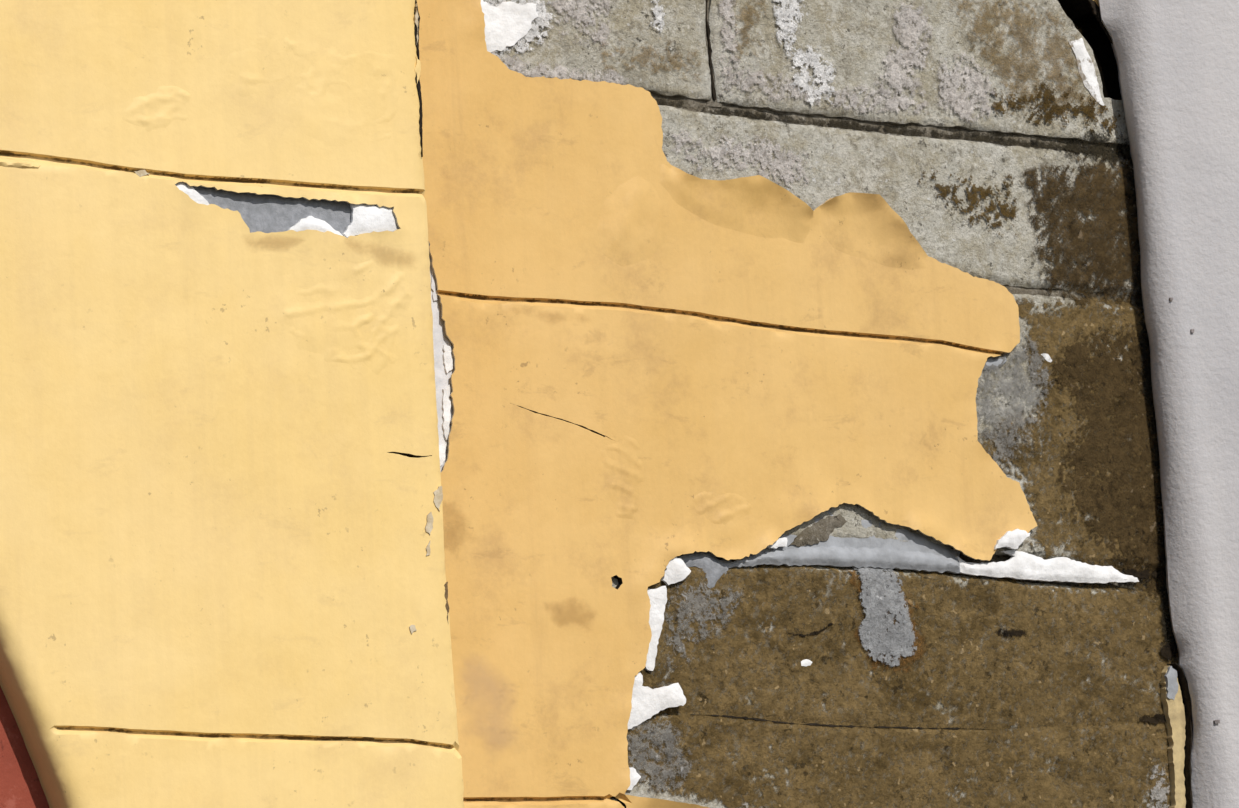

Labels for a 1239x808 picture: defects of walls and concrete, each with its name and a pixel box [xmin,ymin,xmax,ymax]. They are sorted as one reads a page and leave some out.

crack [1057,0,1122,100]
peeling [175,182,399,238]
peeling [425,253,454,556]
crack [511,403,609,438]
peeling [481,0,1179,808]
leakage [626,0,1179,808]